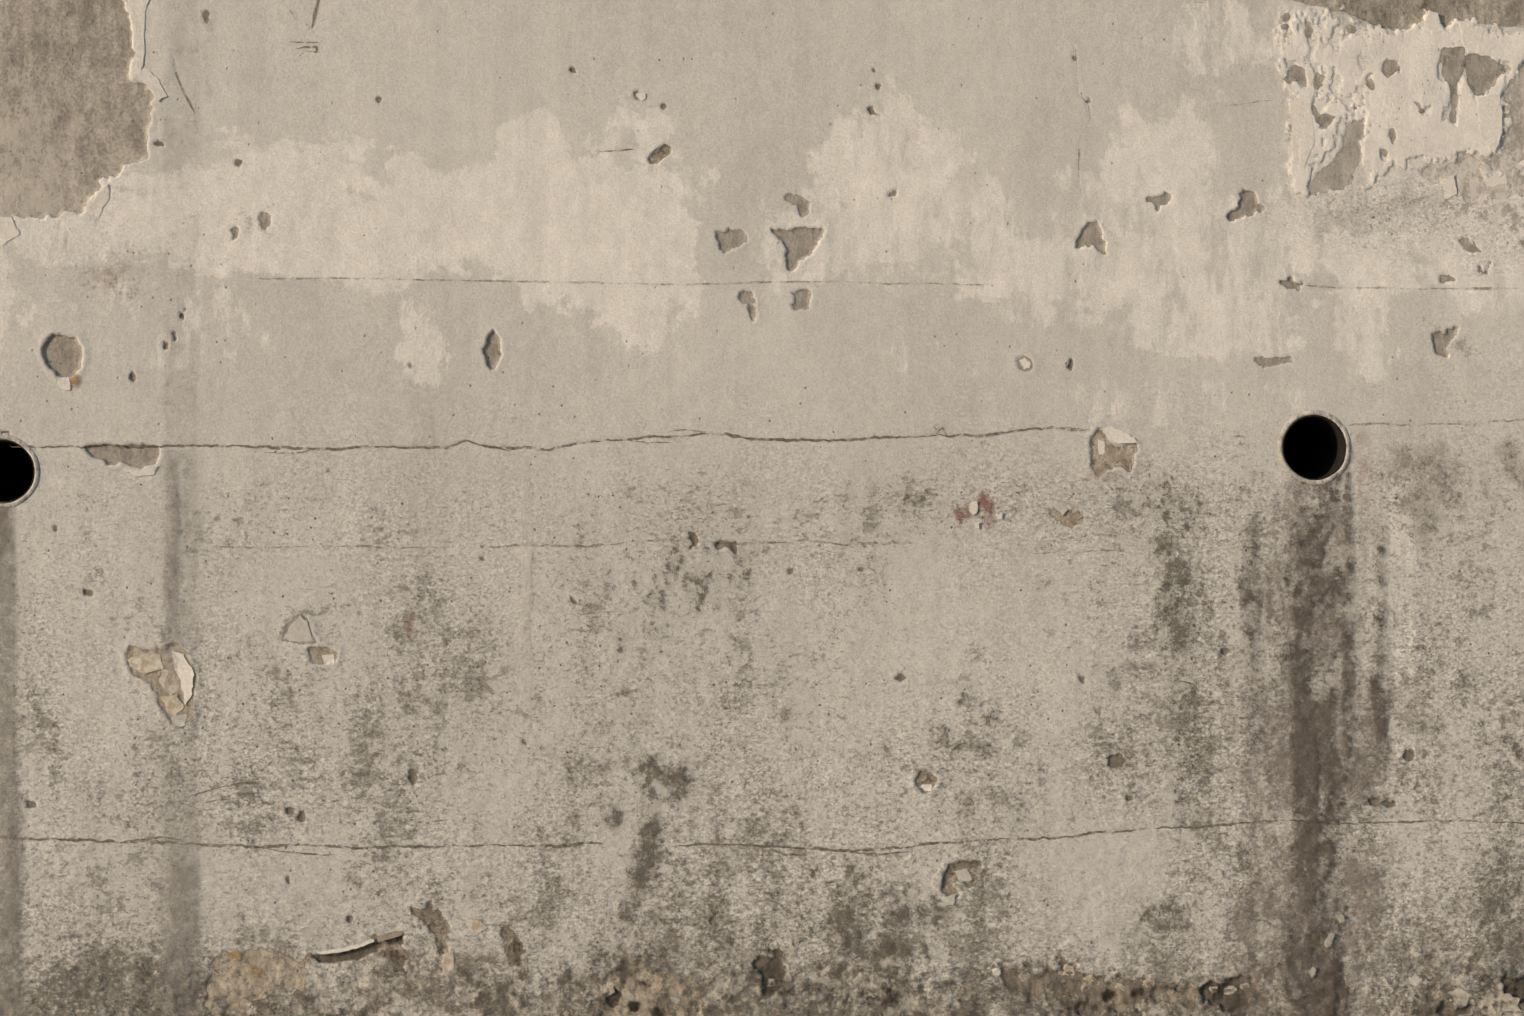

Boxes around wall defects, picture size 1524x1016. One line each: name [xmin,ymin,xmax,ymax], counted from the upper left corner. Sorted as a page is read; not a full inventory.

crack [290,0,319,56]
peeling [0,0,167,245]
peeling [1281,0,1524,246]
peeling [771,194,824,271]
crack [11,426,1085,454]
leakage [1232,468,1391,1016]
crack [0,820,602,856]
leakage [580,742,978,1014]
crack [677,819,1524,856]
leakage [1119,895,1195,938]
leakage [1449,846,1524,985]
peeling [204,931,408,1015]